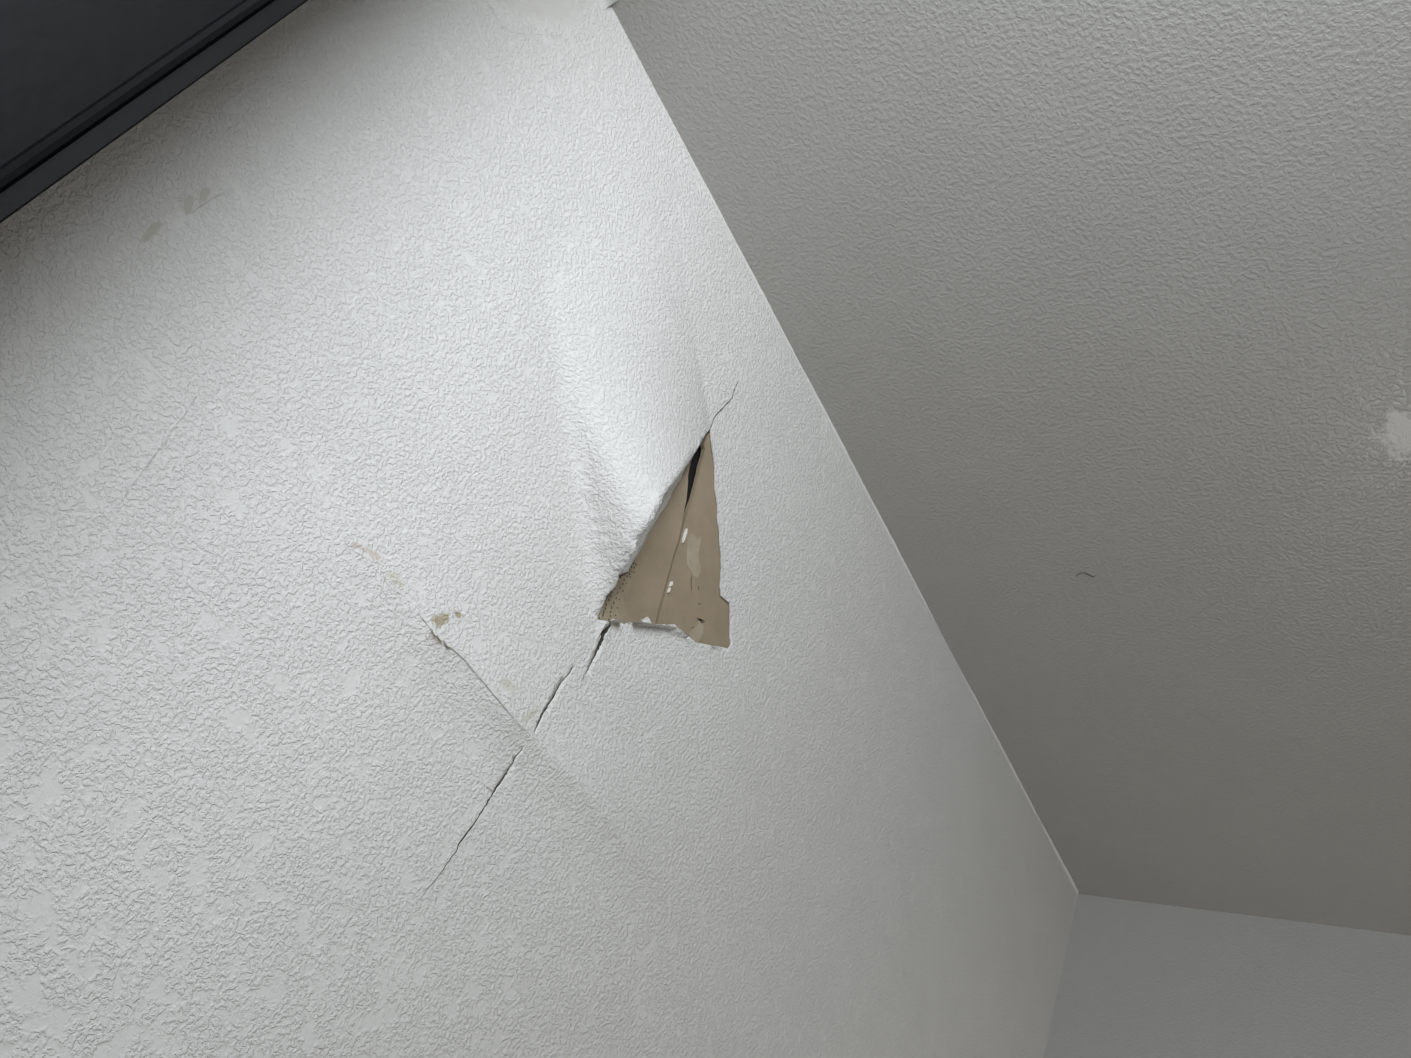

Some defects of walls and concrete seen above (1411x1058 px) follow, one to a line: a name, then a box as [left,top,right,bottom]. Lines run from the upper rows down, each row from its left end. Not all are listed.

crack [418,622,611,901]